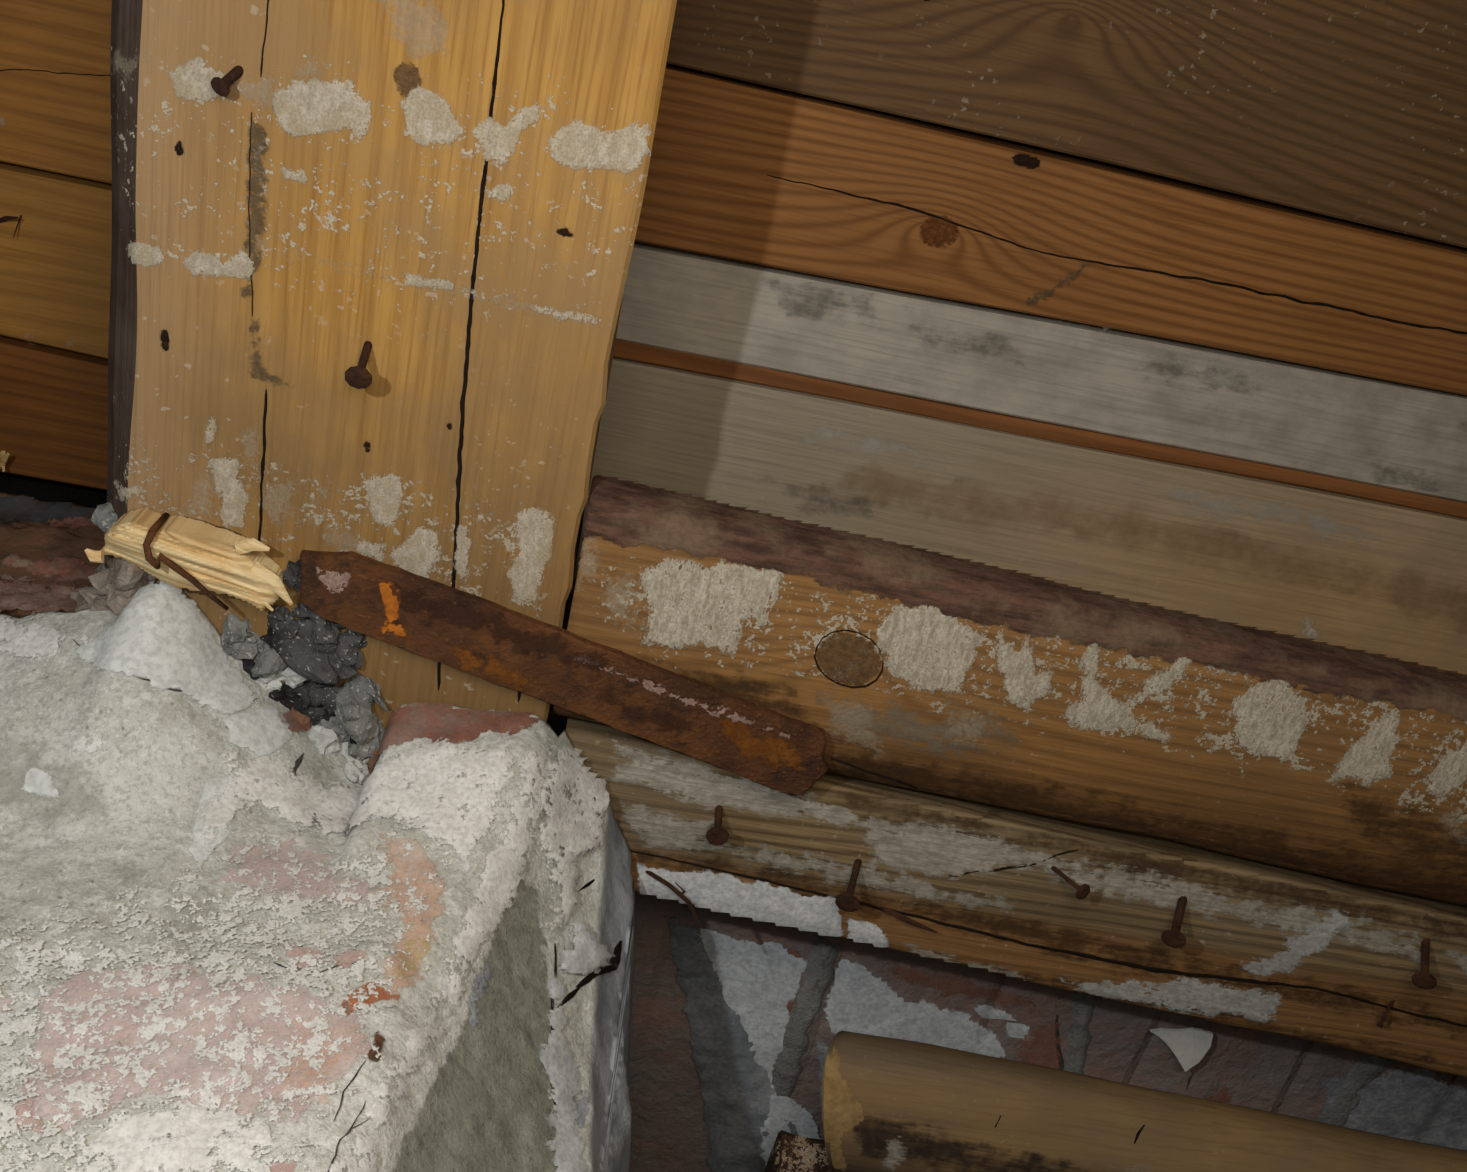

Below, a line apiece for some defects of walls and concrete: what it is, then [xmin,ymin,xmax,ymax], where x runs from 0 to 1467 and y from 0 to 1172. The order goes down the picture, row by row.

crack [260,0,269,77]
crack [489,0,505,119]
crack [246,112,254,317]
crack [769,175,1467,334]
crack [452,159,488,588]
crack [258,389,267,542]
rust [379,582,406,636]
rust [721,719,805,769]